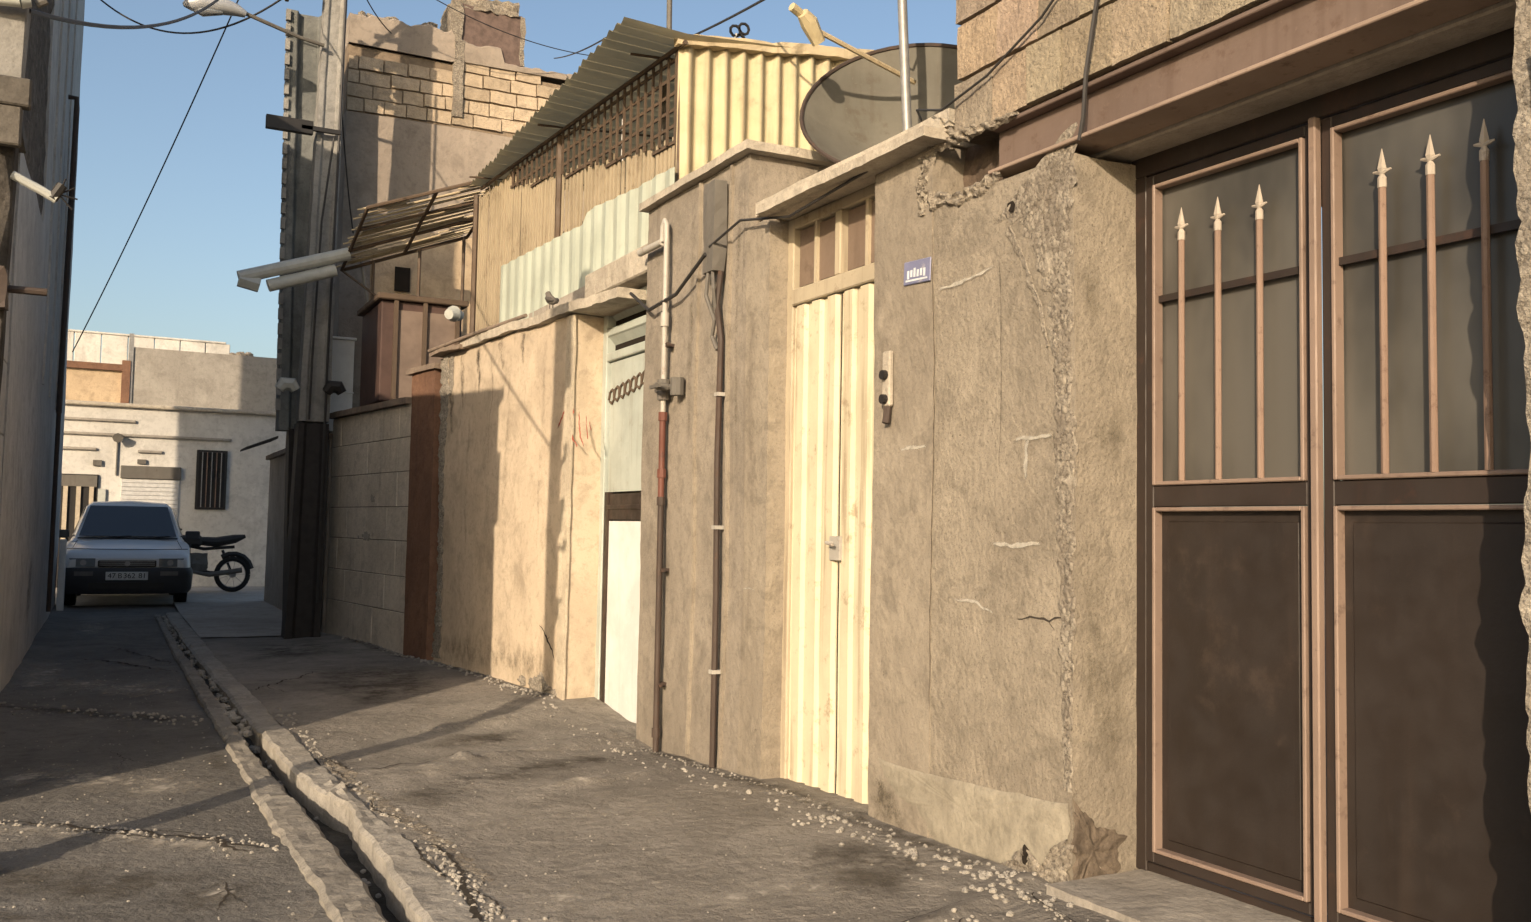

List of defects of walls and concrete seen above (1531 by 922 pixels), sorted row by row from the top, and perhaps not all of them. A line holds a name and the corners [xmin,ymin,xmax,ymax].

spalling [915,111,1019,217]
spalling [995,122,1128,883]
crack [324,761,503,922]